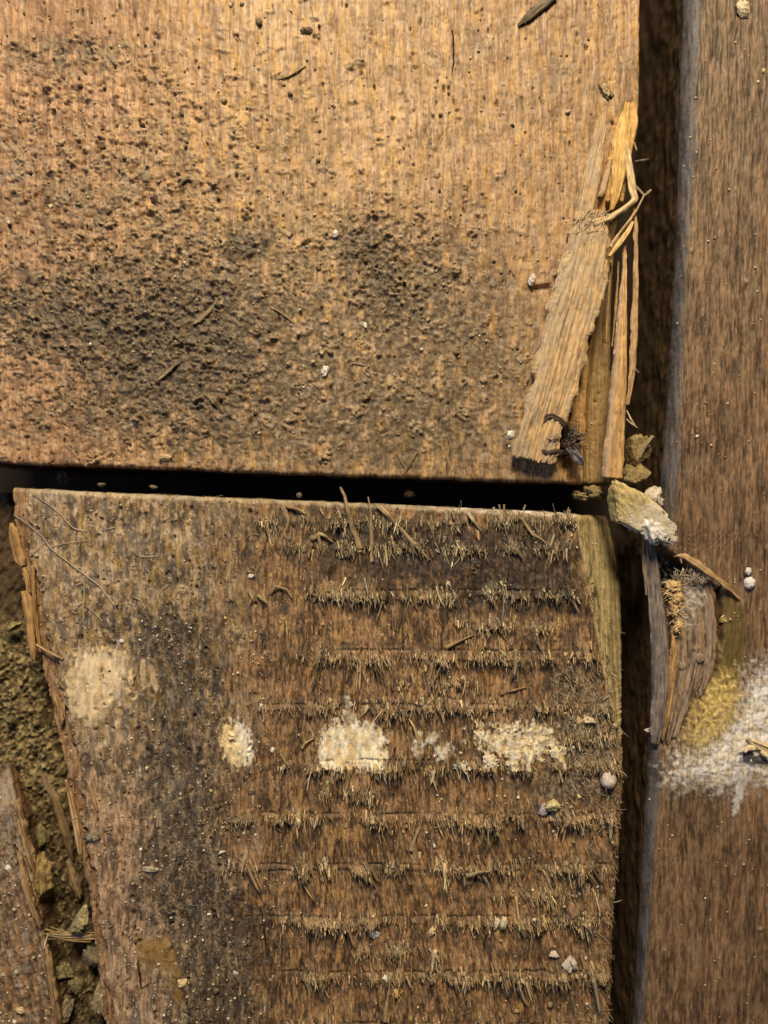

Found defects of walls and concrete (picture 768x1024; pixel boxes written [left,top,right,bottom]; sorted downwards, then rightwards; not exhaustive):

leakage [216,222,269,258]
leakage [328,212,409,336]
leakage [14,245,277,452]
leakage [678,575,706,627]
leakage [312,695,390,773]
leakage [412,712,570,774]
leakage [665,659,768,815]
leakage [60,600,293,1024]